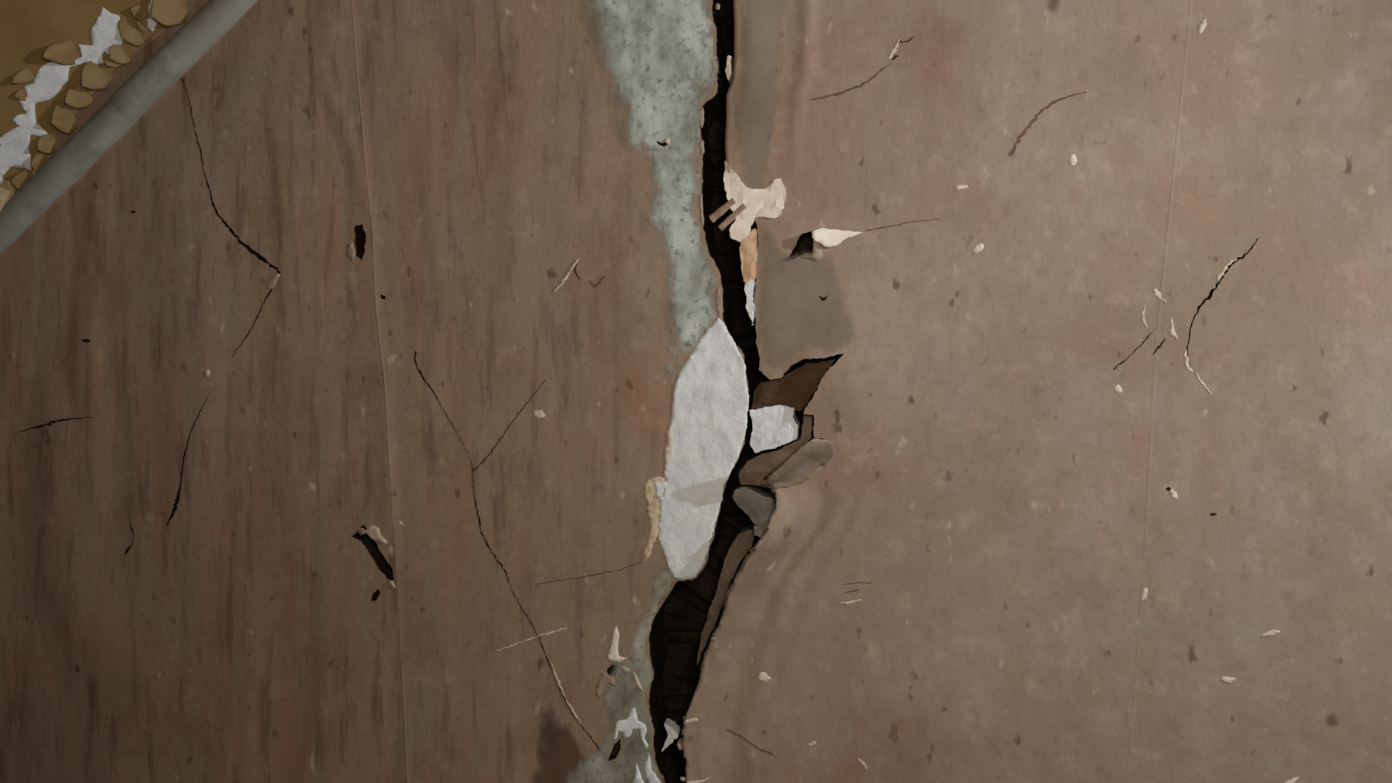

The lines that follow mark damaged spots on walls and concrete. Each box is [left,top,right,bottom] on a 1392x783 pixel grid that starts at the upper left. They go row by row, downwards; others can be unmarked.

peeling [0,0,189,211]
crack [125,79,281,566]
crack [414,351,601,751]
water stain [585,0,715,349]
flaking render [642,318,749,580]
crack [649,0,844,783]
crack [1113,238,1259,395]
flaking render [609,708,661,783]